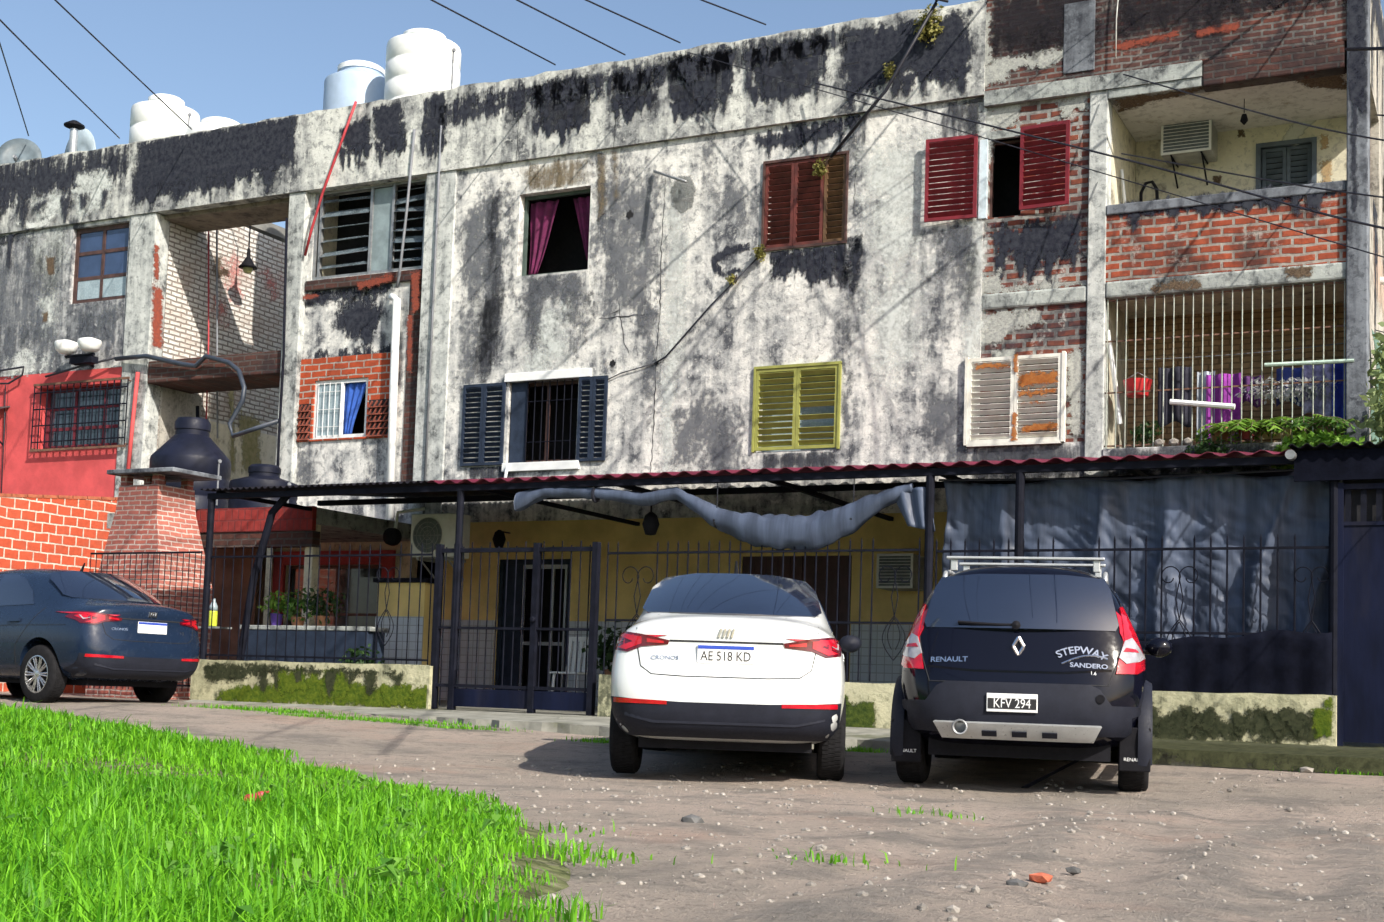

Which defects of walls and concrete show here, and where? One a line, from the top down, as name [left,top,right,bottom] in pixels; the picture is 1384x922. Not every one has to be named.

flaking render [985,11,1064,87]
peeling [1054,95,1090,129]
flaking render [1196,21,1241,37]
spalling [1295,74,1347,90]
damp [0,116,298,369]
damp [339,0,1384,435]
peeling [961,102,1087,357]
spalling [1284,265,1314,279]
damp [305,283,395,359]
damp [666,388,835,485]
damp [923,385,1079,479]
damp [203,662,405,698]